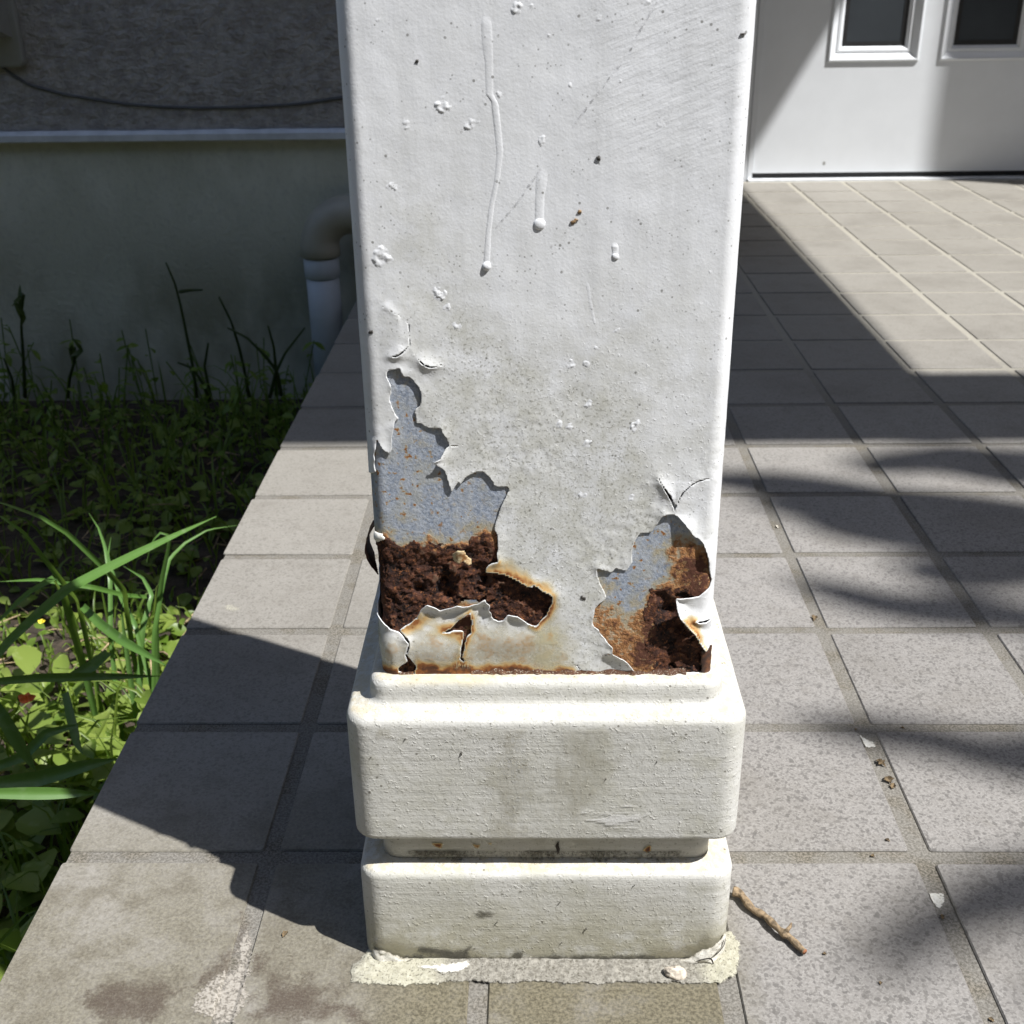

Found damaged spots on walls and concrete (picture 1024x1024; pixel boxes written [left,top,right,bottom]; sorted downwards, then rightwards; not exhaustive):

peeling [365,354,553,672]
crack [660,479,705,501]
corrosion [382,560,686,676]
peeling [581,501,712,673]
corrosion [683,616,708,651]